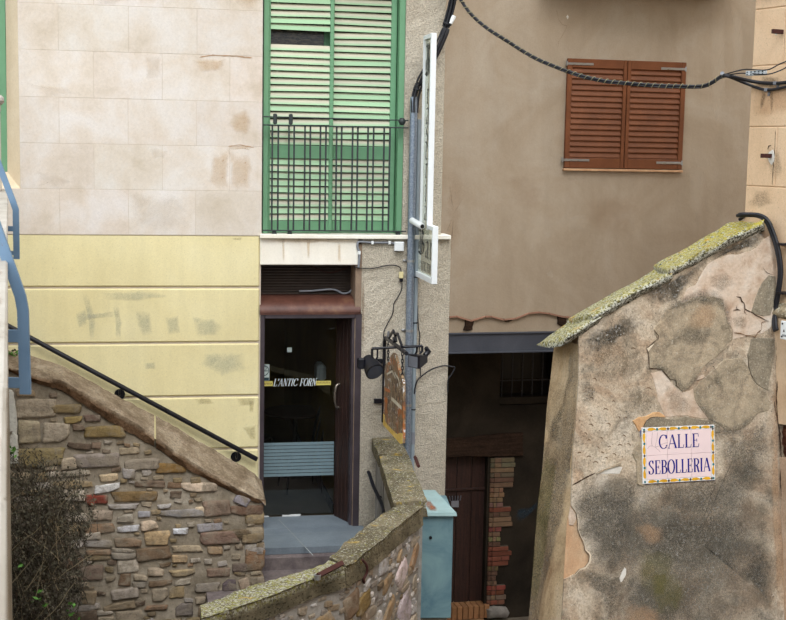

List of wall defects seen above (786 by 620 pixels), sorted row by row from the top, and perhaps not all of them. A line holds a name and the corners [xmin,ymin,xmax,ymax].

flaking render [618,412,665,432]
flaking render [568,507,591,576]